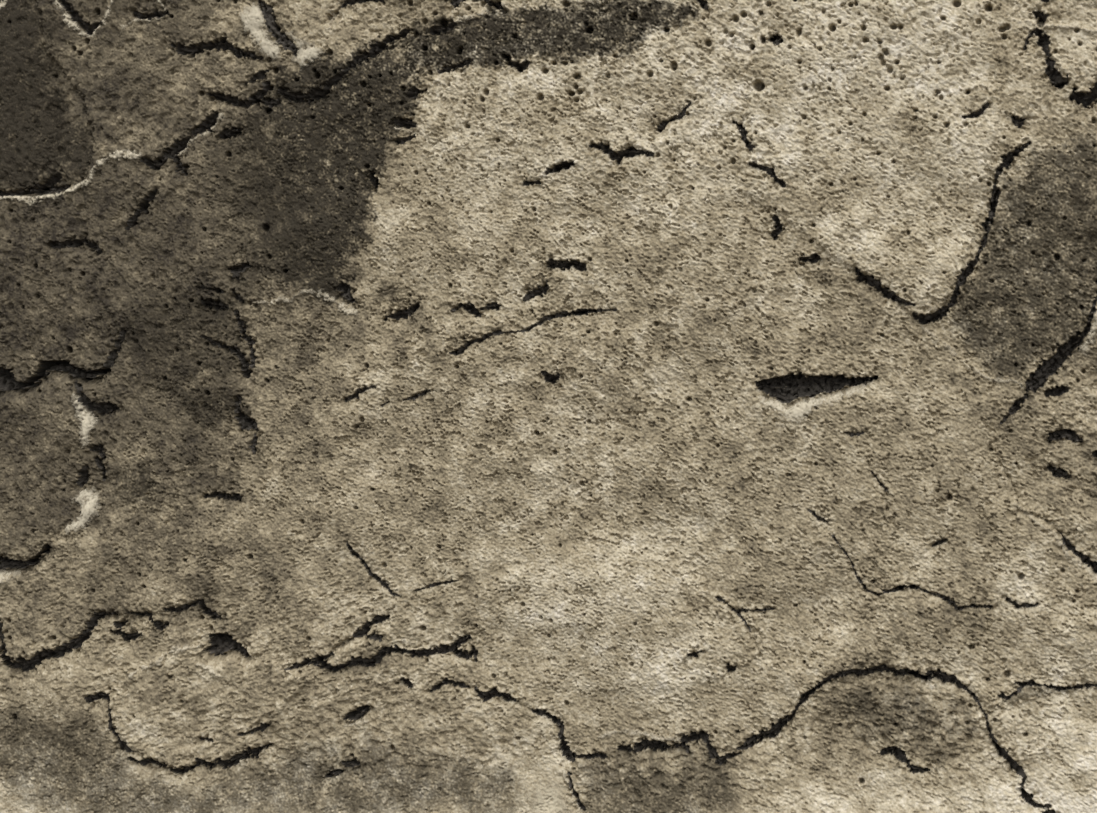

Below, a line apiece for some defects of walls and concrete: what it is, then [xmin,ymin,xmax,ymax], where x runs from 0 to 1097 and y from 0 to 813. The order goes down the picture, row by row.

crack [0,173,71,197]
water stain [0,0,99,212]
crack [126,0,457,230]
crack [393,60,471,144]
crack [855,141,1031,324]
water stain [958,138,1097,378]
spalling [756,372,878,423]
crack [1000,281,1097,424]
water stain [118,462,159,502]
crack [0,599,221,671]
crack [84,692,272,774]
crack [284,533,1097,810]